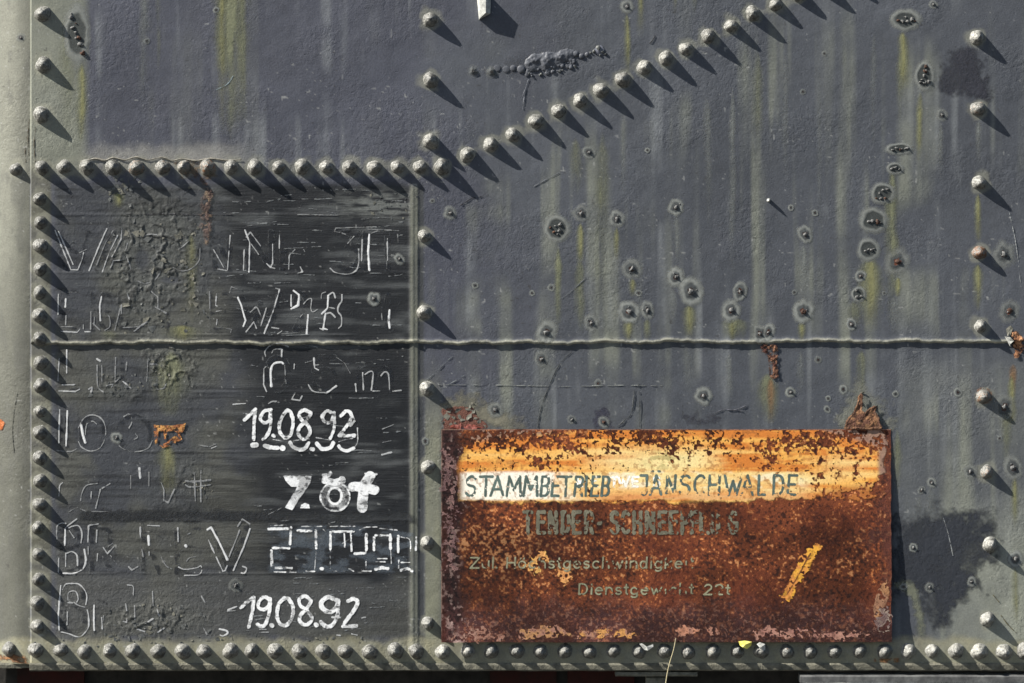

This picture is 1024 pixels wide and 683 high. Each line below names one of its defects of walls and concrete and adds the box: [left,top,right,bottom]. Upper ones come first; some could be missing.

damp [939,47,988,100]
peeling [105,175,209,333]
rust [1012,331,1024,358]
rust [154,423,186,448]
rust [844,392,882,429]
damp [891,511,997,634]